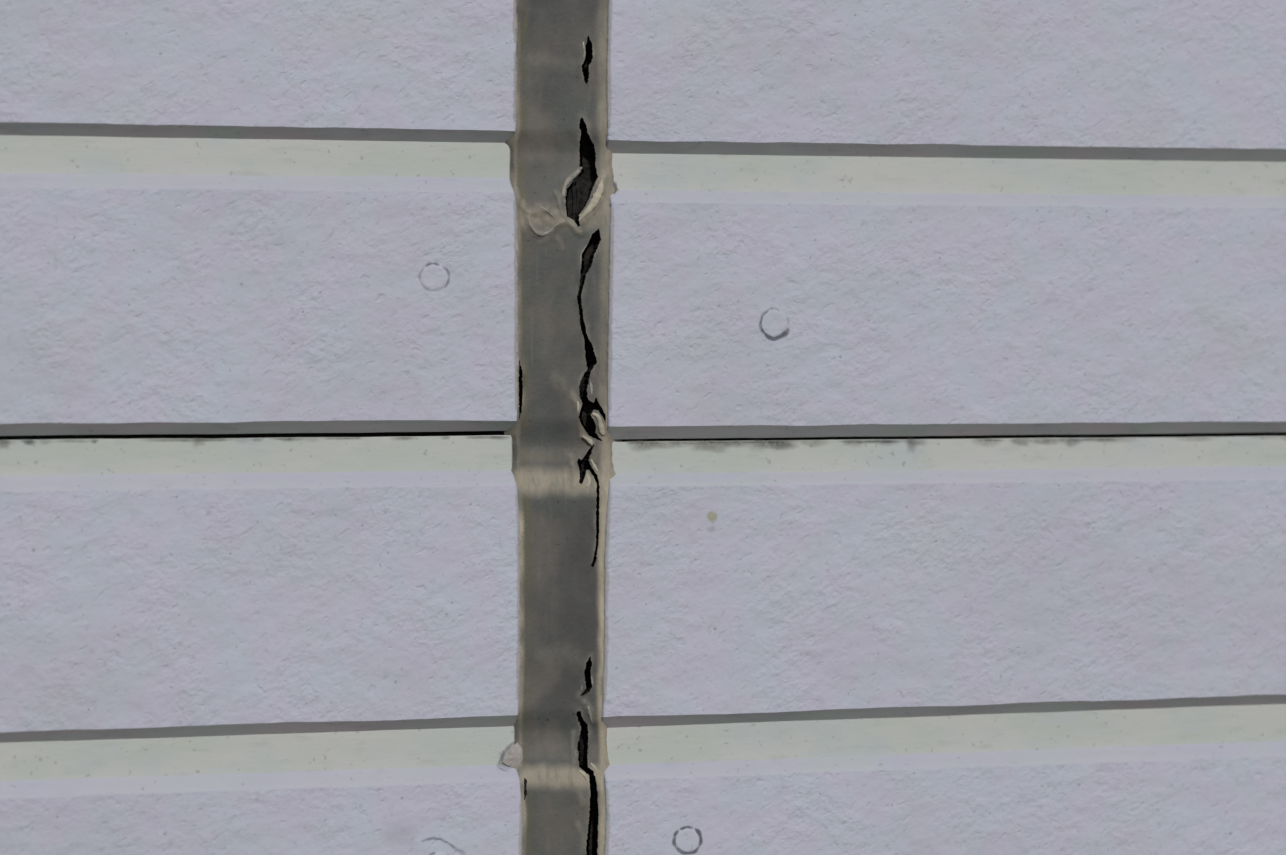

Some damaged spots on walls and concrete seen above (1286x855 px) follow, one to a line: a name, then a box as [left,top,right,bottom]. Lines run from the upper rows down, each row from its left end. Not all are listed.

crack [582,36,593,84]
crack [529,117,606,567]
crack [575,656,599,855]